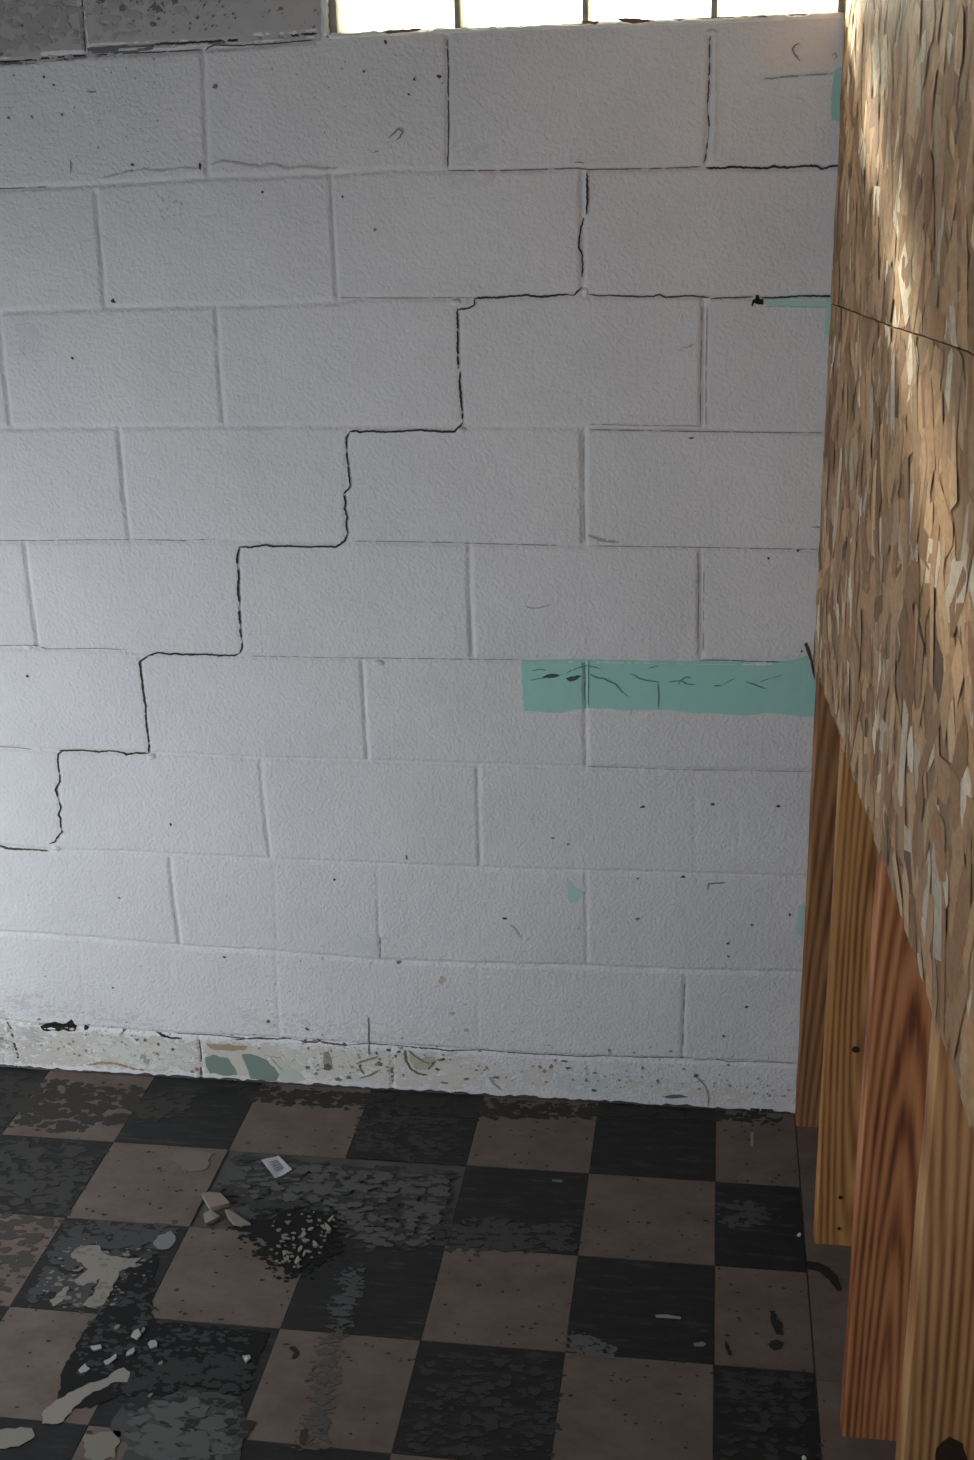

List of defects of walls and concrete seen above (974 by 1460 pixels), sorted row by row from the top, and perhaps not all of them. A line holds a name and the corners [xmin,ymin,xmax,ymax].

crack [0,36,838,852]
spalling [40,1019,89,1031]
peeling [198,1039,292,1078]